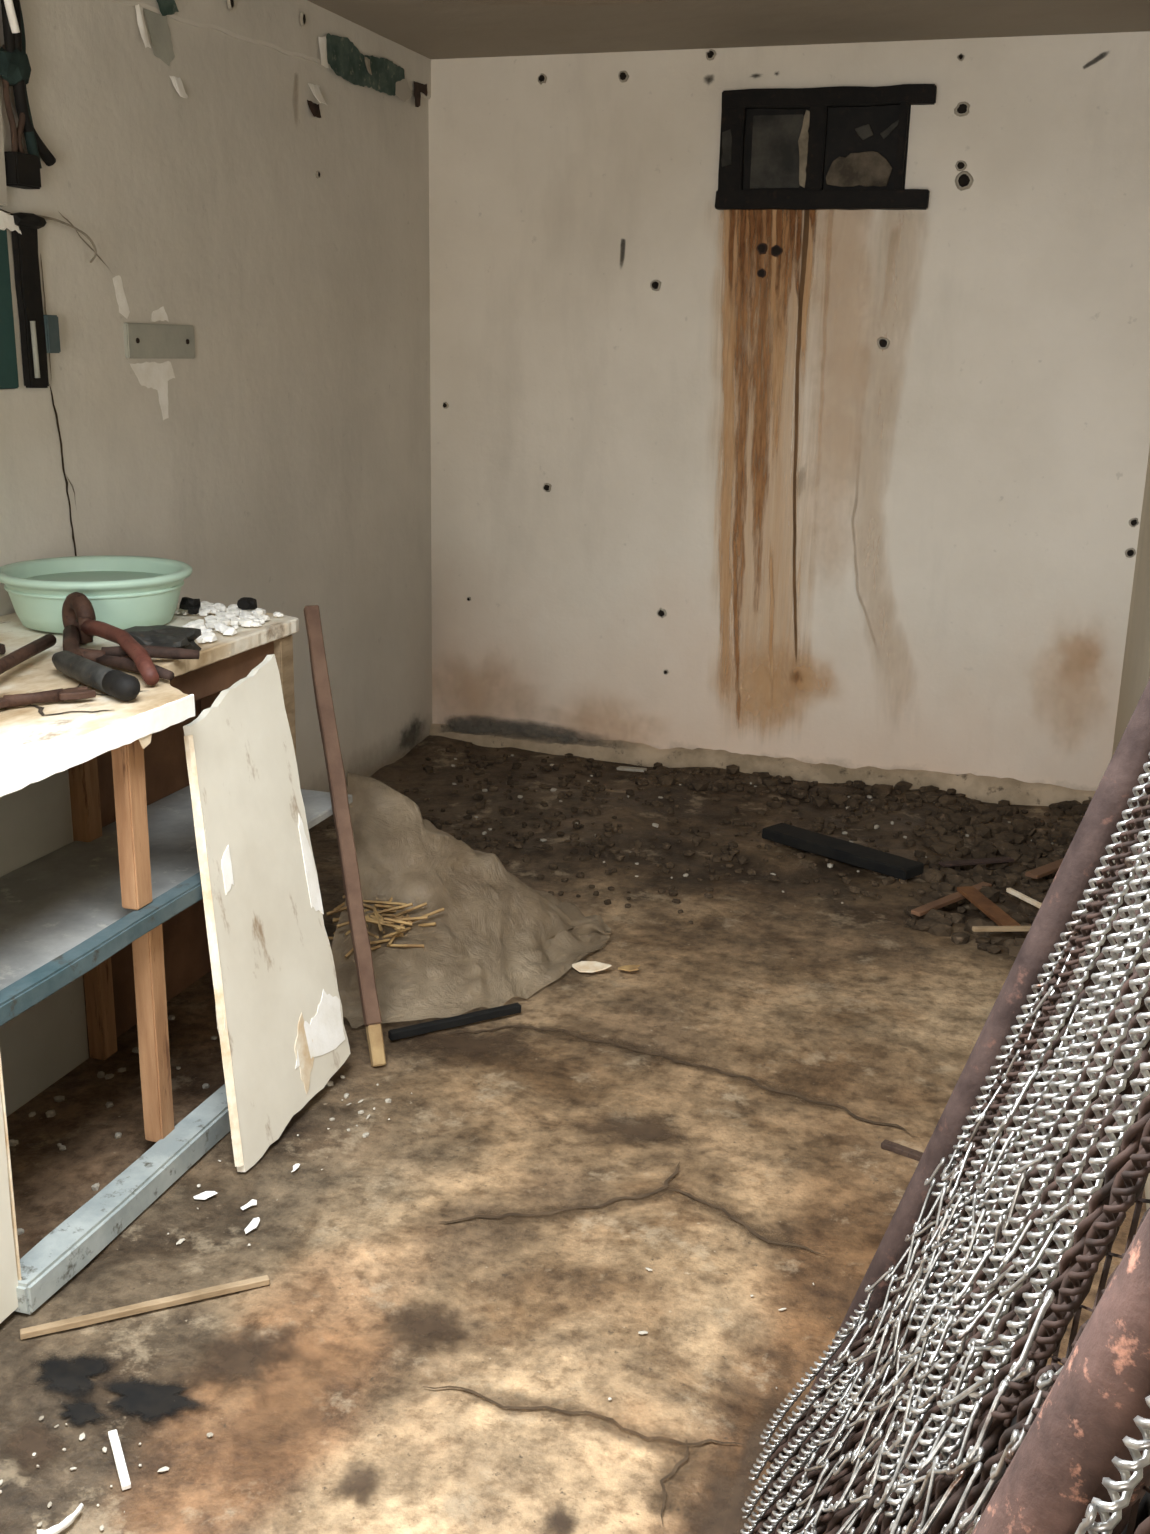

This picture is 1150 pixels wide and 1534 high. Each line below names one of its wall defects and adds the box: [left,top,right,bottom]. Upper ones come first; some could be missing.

peeling [135,0,188,98]
peeling [307,83,327,118]
peeling [319,33,428,107]
flaking render [0,211,21,234]
peeling [113,275,130,318]
peeling [152,306,169,322]
peeling [130,361,175,420]
rust [719,209,821,725]
crack [441,1025,916,1137]
crack [442,1162,824,1255]
crack [423,1386,745,1524]